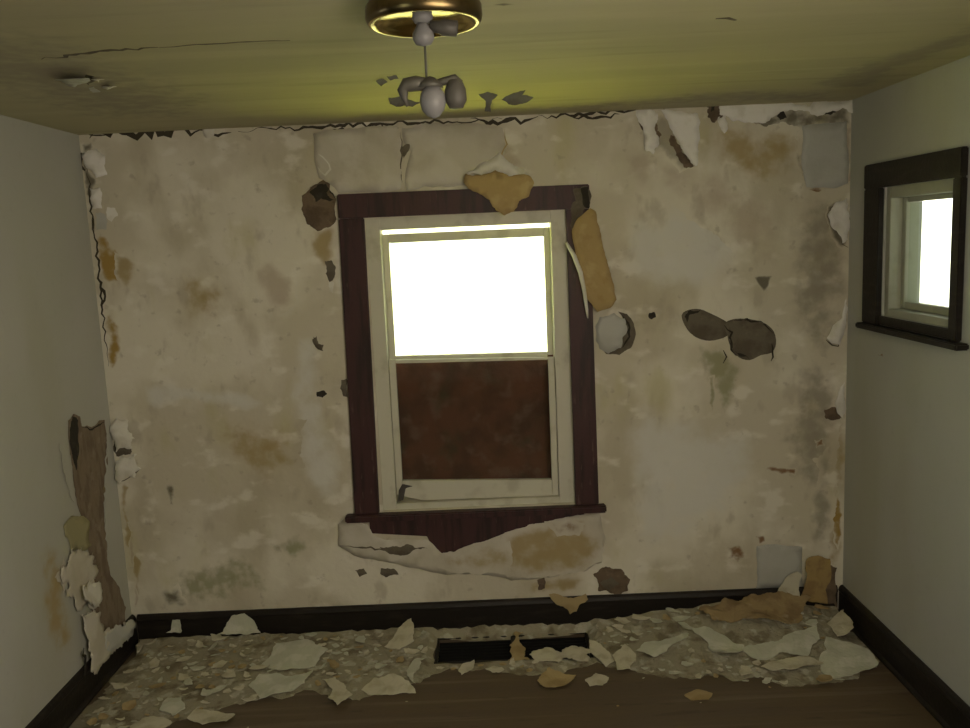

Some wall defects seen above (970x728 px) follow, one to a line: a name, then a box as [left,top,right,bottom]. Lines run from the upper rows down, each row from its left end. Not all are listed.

flaking render [655,124,693,168]
flaking render [755,104,851,132]
leakage [80,141,138,290]
spalling [301,180,338,293]
crack [81,110,635,366]
leakage [174,272,234,327]
spalling [682,309,776,361]
leakage [210,410,307,492]
spalling [59,414,136,651]
leakage [158,531,310,613]
leakage [437,518,605,596]
spalling [593,567,630,594]